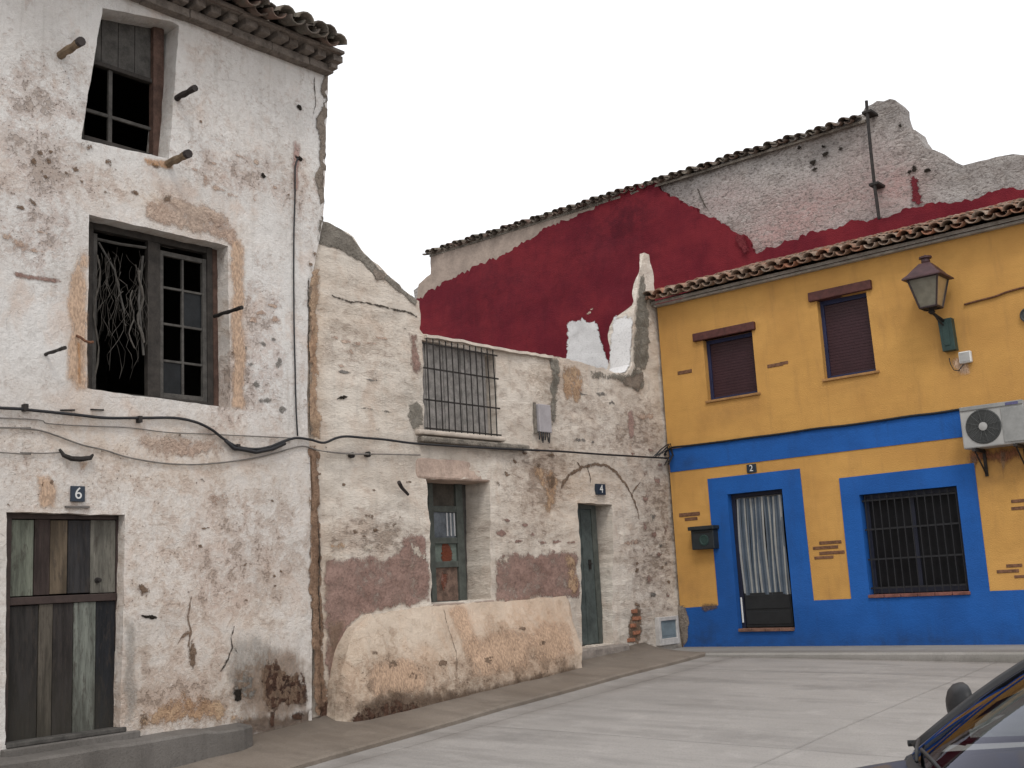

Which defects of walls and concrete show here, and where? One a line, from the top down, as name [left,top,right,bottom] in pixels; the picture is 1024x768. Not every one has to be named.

crack [307,280,417,435]
peeling [140,75,678,727]
crack [561,462,640,516]
crack [177,596,195,668]
crack [221,626,237,671]